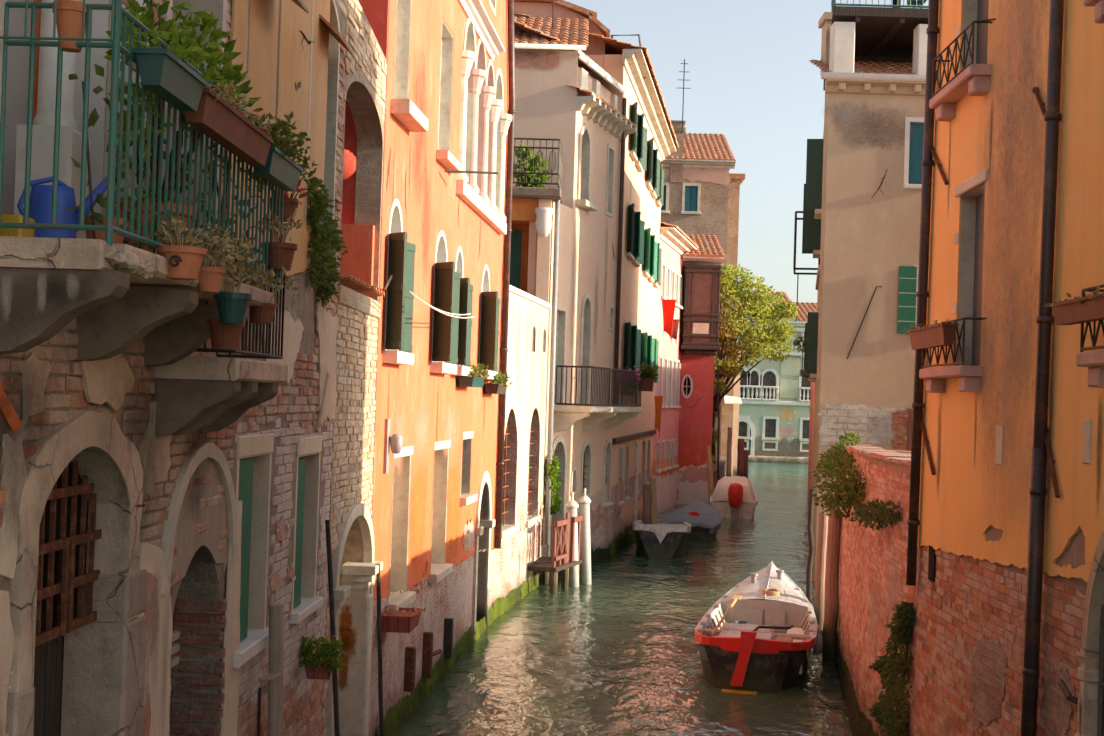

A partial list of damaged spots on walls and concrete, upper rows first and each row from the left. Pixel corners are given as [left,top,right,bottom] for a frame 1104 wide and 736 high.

flaking render [985,525,1003,542]
flaking render [1056,528,1086,569]
flaking render [0,590,15,736]
corrosion [339,606,356,688]
spalling [969,637,1008,731]